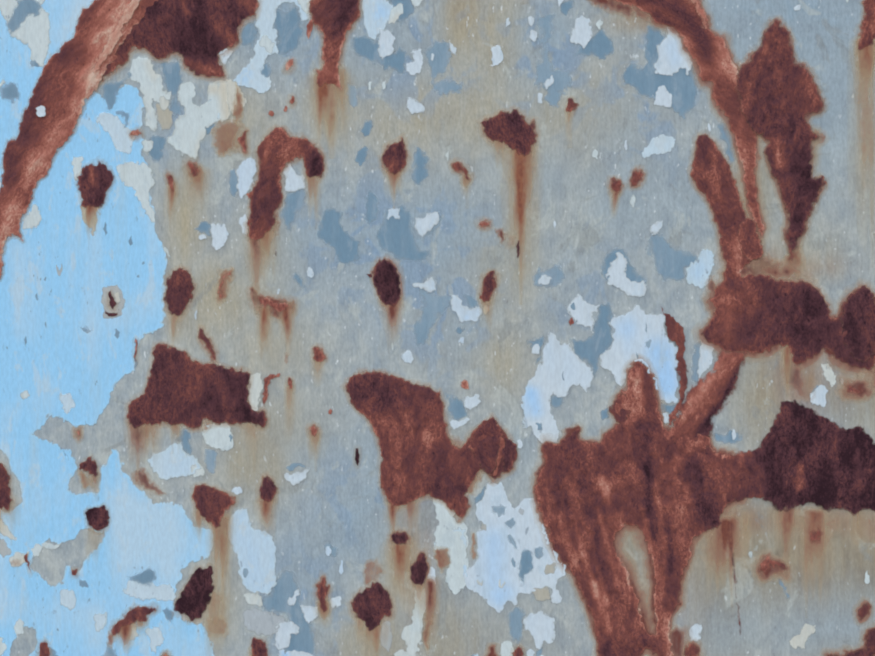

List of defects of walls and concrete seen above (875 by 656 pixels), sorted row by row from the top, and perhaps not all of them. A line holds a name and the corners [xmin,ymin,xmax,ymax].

rust [0,0,259,276]
peeling [0,0,318,656]
rust [127,328,293,453]
rust [231,127,325,340]
peeling [521,249,679,443]
peeling [642,134,676,158]
peeling [623,26,697,119]
rust [532,0,875,656]
rust [174,483,236,634]
peeling [330,596,342,608]
rust [345,370,517,619]
peeling [379,482,566,656]